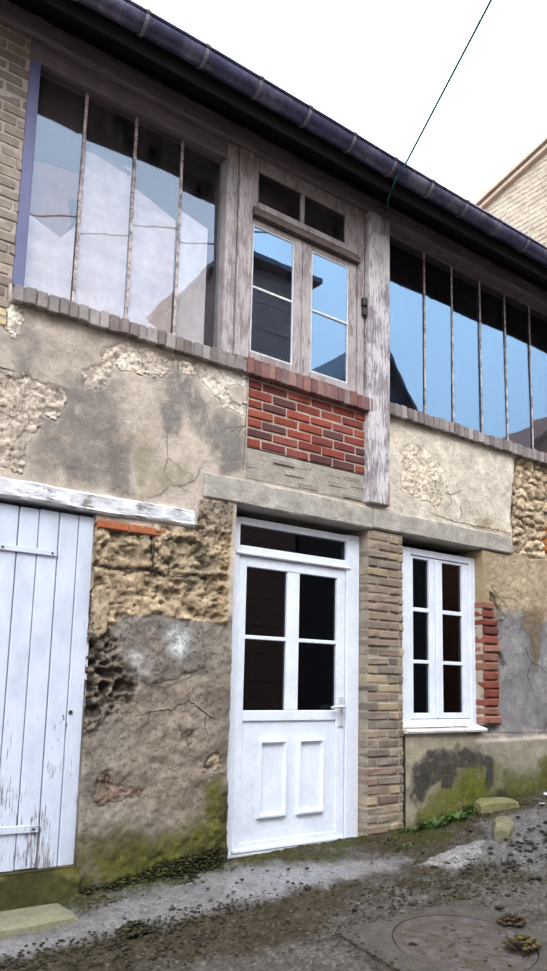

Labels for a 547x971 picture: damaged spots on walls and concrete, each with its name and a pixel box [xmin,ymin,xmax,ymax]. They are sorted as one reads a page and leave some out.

flaking render [81,342,247,415]
flaking render [0,371,67,473]
flaking render [510,459,547,559]
crack [133,670,216,734]
leakage [410,748,494,802]